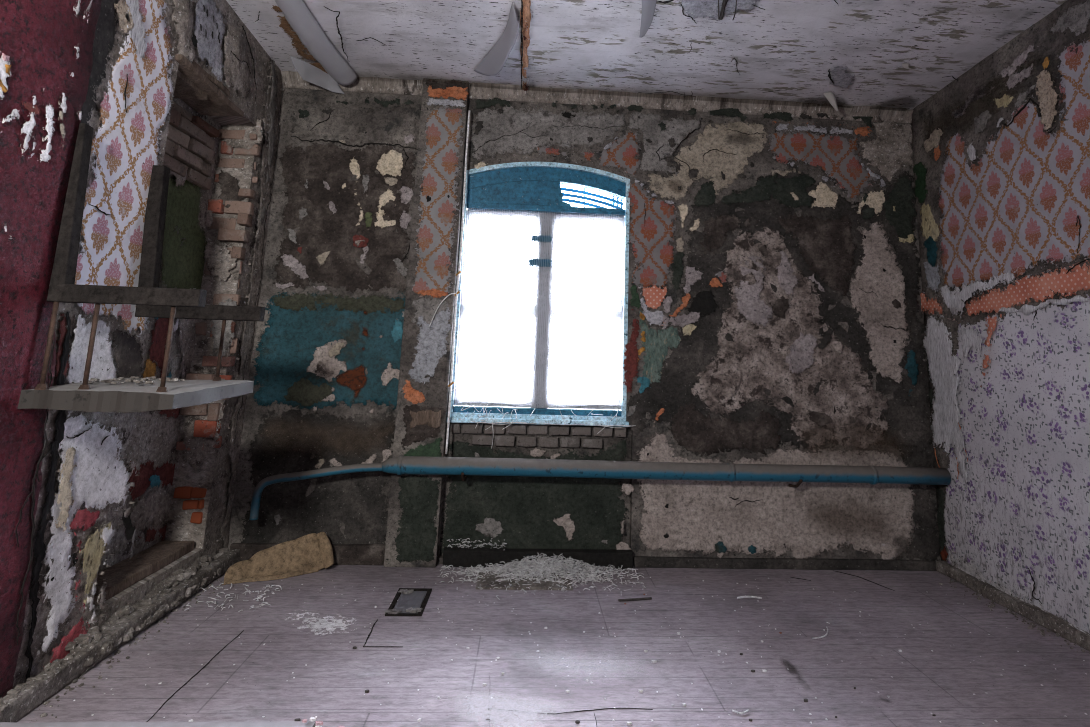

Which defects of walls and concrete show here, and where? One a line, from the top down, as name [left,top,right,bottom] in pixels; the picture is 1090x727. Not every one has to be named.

flaking render [0,0,120,163]
peeling [193,0,225,82]
peeling [951,44,1049,135]
peeling [1048,0,1090,36]
flaking render [32,57,948,667]